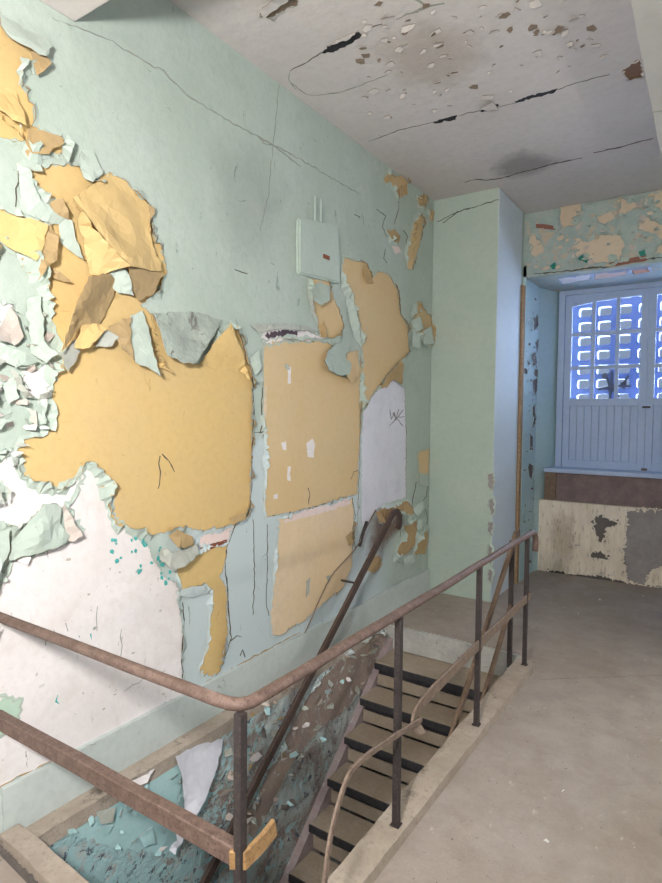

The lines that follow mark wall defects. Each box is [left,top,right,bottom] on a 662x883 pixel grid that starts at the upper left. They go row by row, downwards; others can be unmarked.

flaking render [0,732,51,791]
peeling [132,738,234,821]
flaking render [247,628,390,841]
peeling [68,802,183,857]
spalling [0,844,38,883]